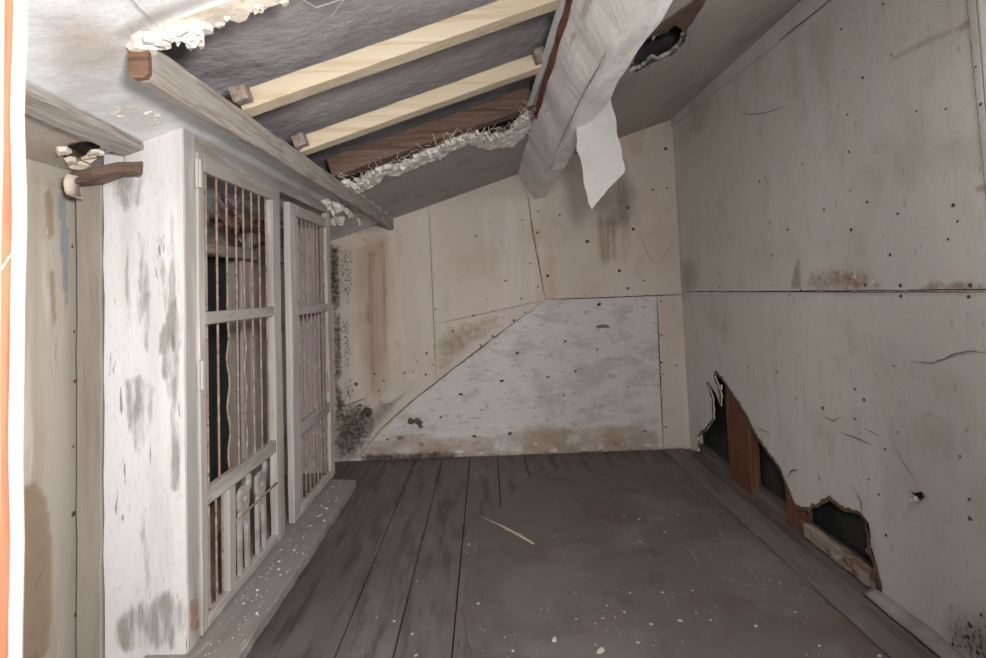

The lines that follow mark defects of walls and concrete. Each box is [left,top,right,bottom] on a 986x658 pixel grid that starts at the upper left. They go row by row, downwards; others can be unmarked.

spalling [125,0,289,56]
spalling [635,0,706,73]
crack [769,0,830,49]
crack [966,0,986,197]
spalling [55,141,104,170]
spalling [337,100,532,194]
spalling [321,198,361,226]
leakage [330,245,354,305]
crack [358,199,986,457]
leakage [335,318,373,457]
leakage [949,613,986,658]